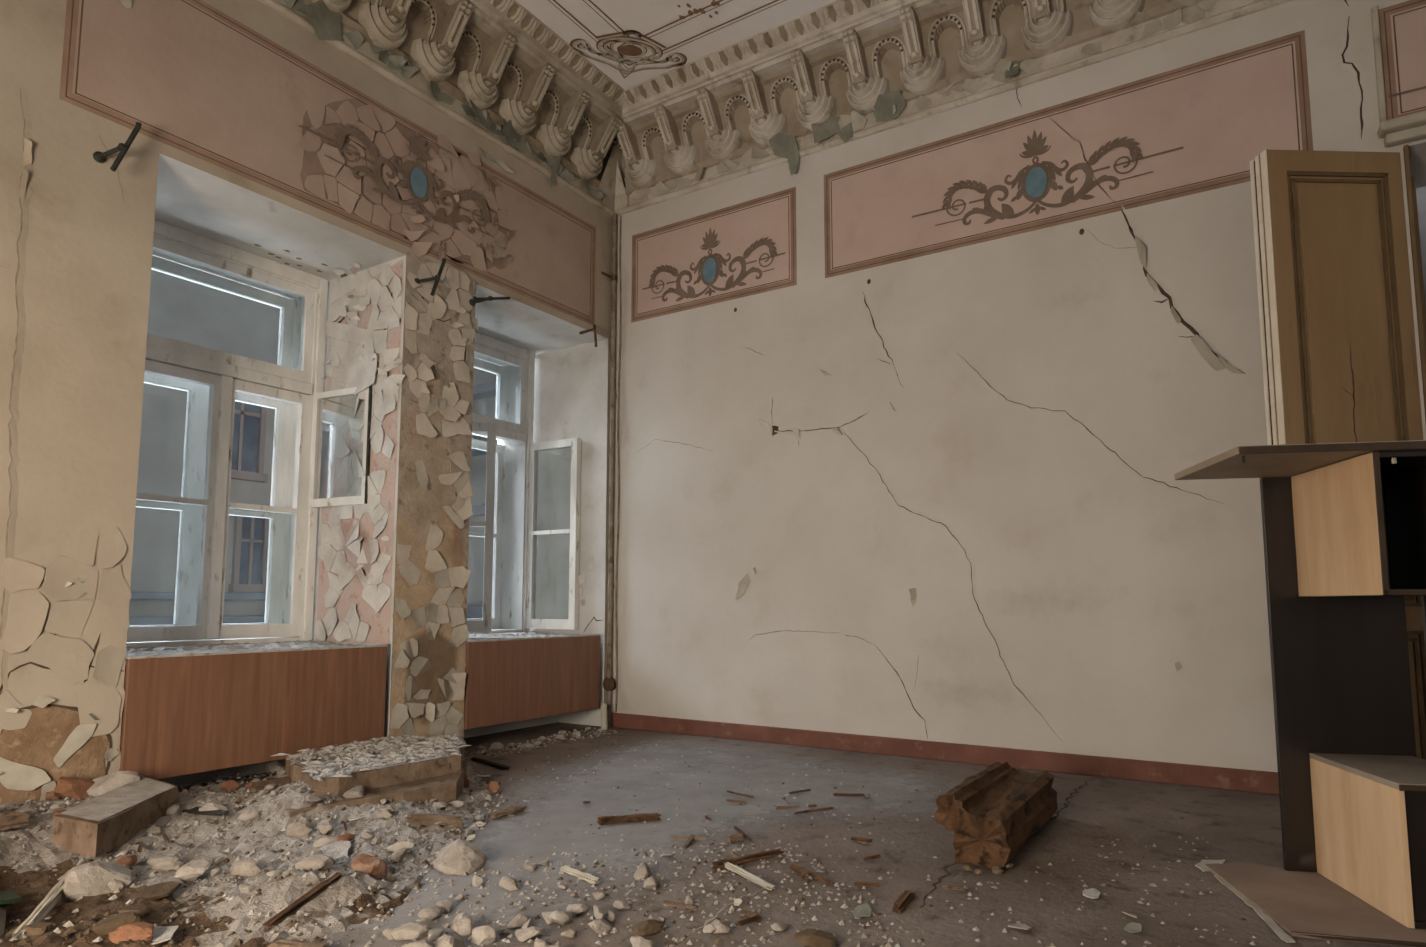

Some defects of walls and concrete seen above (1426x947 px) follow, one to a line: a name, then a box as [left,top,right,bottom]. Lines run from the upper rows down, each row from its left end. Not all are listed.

peeling [276,0,309,21]
peeling [796,0,1260,150]
crack [1336,0,1364,140]
crack [1016,88,1250,374]
crack [0,88,56,728]
peeling [254,98,512,781]
crack [859,292,903,387]
crack [955,353,1223,508]
crack [749,397,1066,741]
peeling [0,520,131,805]
crack [84,633,124,683]